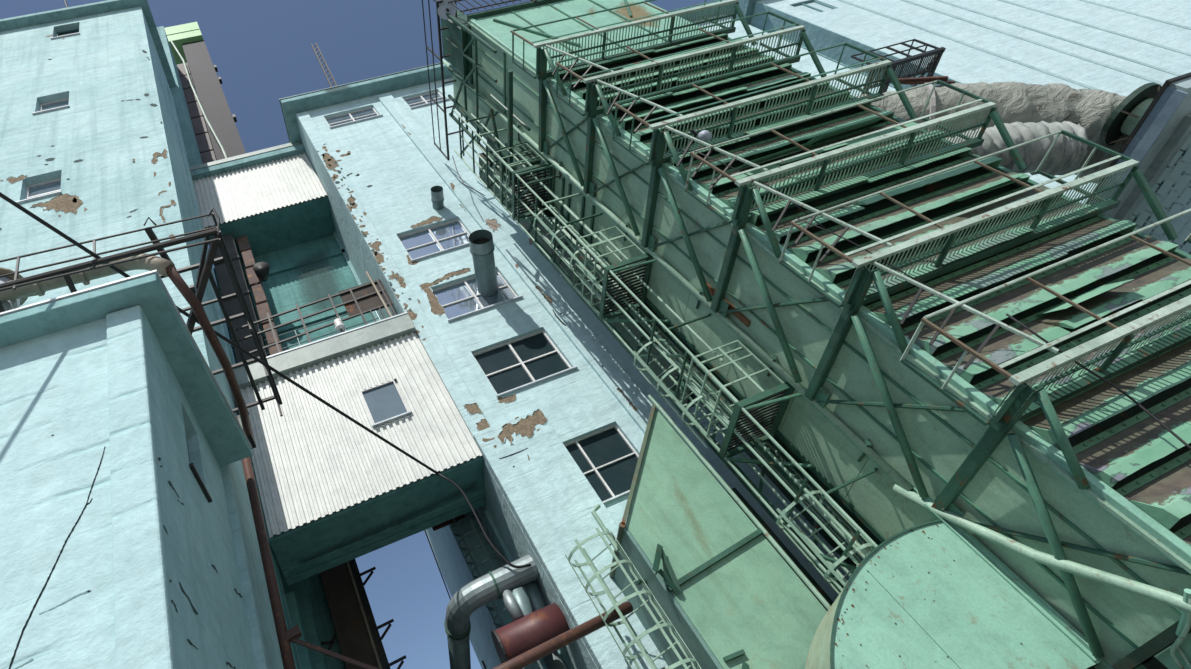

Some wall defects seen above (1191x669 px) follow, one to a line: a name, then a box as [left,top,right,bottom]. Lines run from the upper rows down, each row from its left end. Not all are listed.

spalling [151,149,168,177]
peeling [31,178,88,217]
spalling [158,181,177,240]
spalling [317,144,470,340]
peeling [497,394,517,404]
spalling [463,402,548,448]
crack [9,446,106,669]